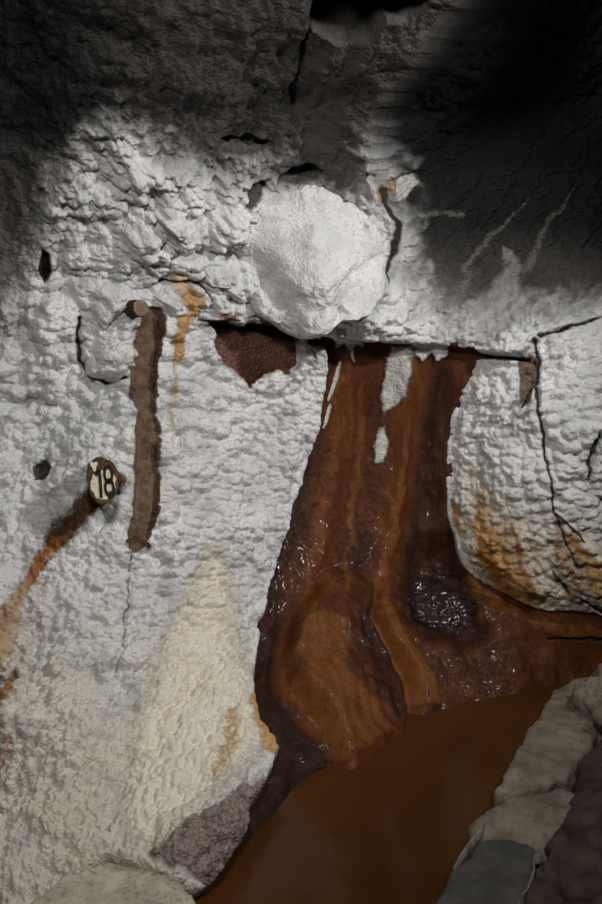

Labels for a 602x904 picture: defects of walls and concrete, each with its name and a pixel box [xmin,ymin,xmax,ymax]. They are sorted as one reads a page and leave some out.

crack [366,172,403,299]
corrosion [169,272,206,425]
crack [156,276,323,359]
spalling [200,319,314,398]
crack [485,316,602,612]
corrosion [0,665,20,707]
corrosion [0,489,103,665]
corrosion [230,336,602,859]
crack [548,635,602,643]